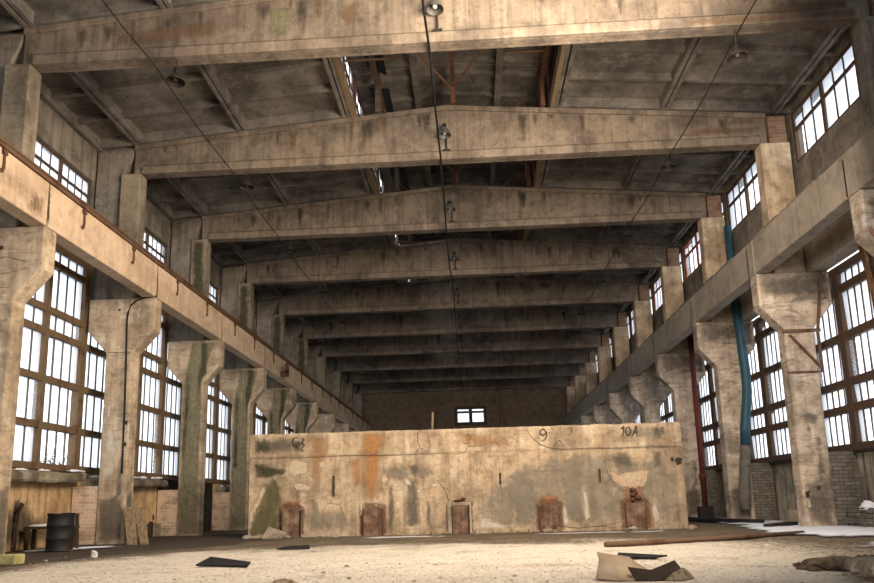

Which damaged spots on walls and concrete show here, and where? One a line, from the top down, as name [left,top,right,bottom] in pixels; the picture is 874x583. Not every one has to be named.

leakage [187,343,207,388]
leakage [236,371,253,425]
leakage [477,453,675,521]